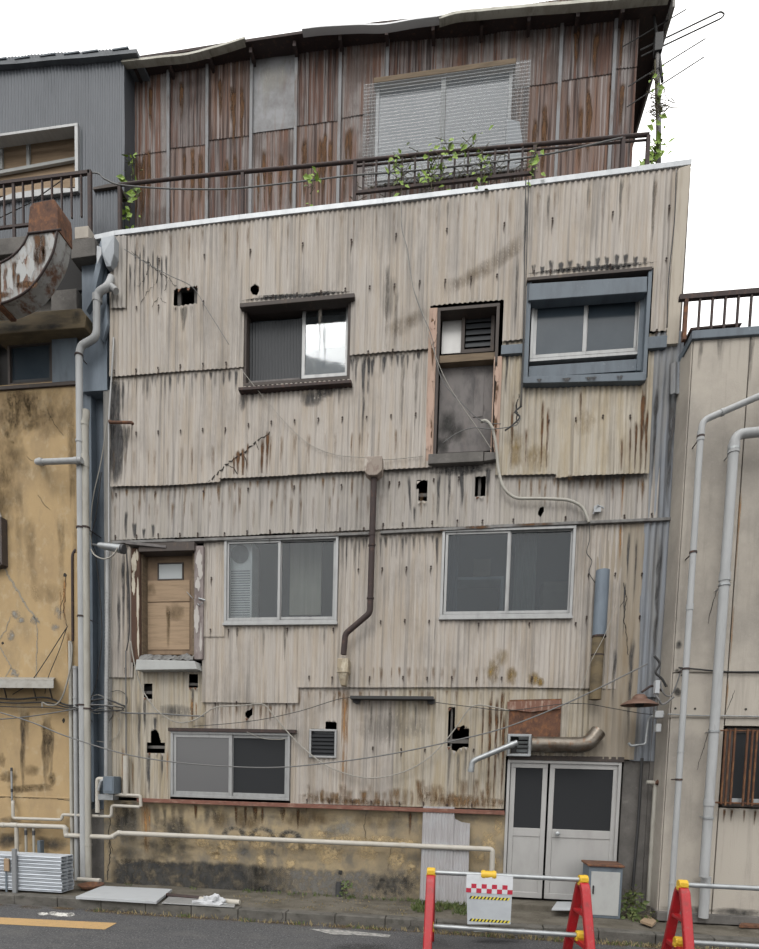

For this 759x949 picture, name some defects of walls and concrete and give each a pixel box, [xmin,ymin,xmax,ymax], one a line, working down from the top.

corrosion [1,263,37,297]
corrosion [34,235,45,264]
corrosion [233,420,272,503]
corrosion [541,404,550,458]
corrosion [621,395,648,463]
crack [0,568,68,677]
corrosion [331,676,348,740]
damp [116,808,133,830]
damp [114,812,419,898]